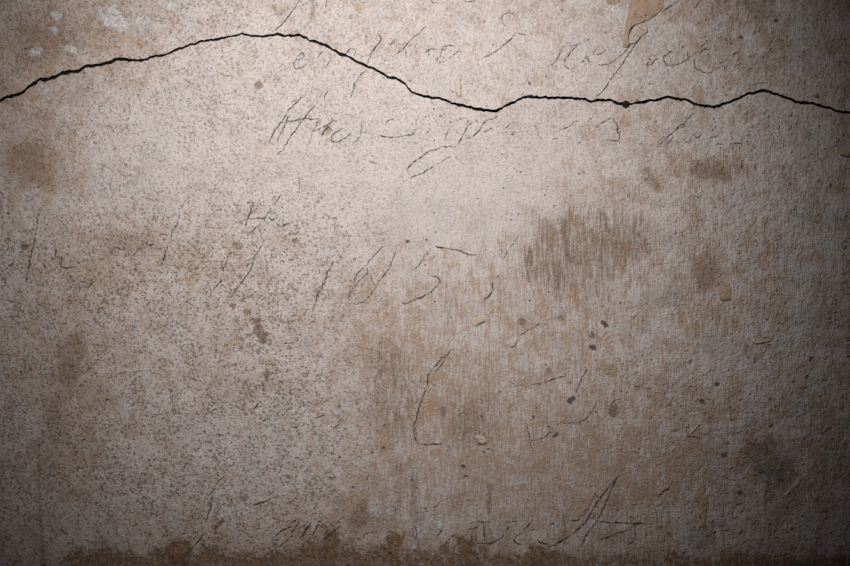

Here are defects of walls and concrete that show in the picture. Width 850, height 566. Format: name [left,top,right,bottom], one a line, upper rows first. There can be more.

peeling [623,0,664,48]
crack [0,32,850,114]
water stain [60,513,850,566]